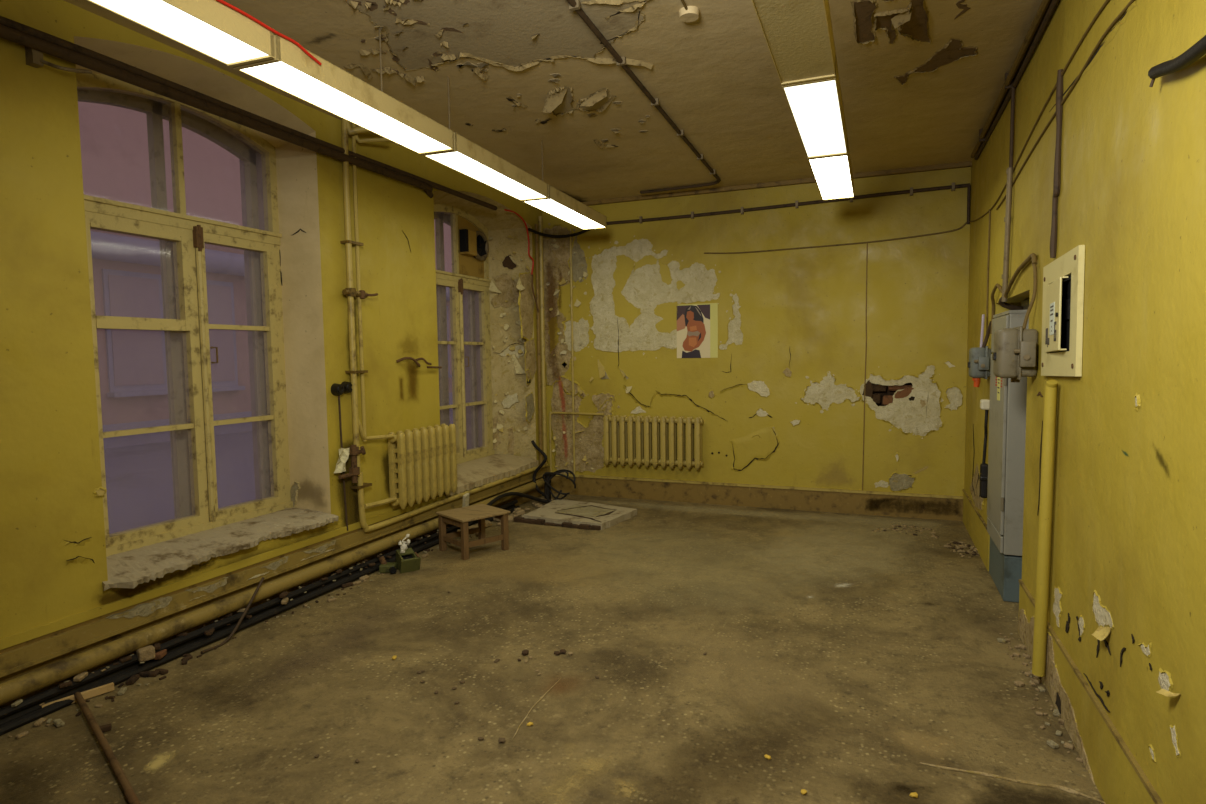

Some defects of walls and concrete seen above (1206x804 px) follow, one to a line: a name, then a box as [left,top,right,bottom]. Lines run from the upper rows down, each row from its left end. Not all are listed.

peeling [851,0,978,85]
peeling [488,223,744,474]
crack [617,320,780,473]
spalling [782,360,963,439]
spalling [874,452,916,492]
spalling [248,540,336,580]
peeling [1078,590,1114,641]
spalling [1018,586,1095,785]
peeling [1138,642,1180,697]
peeling [1169,724,1181,758]